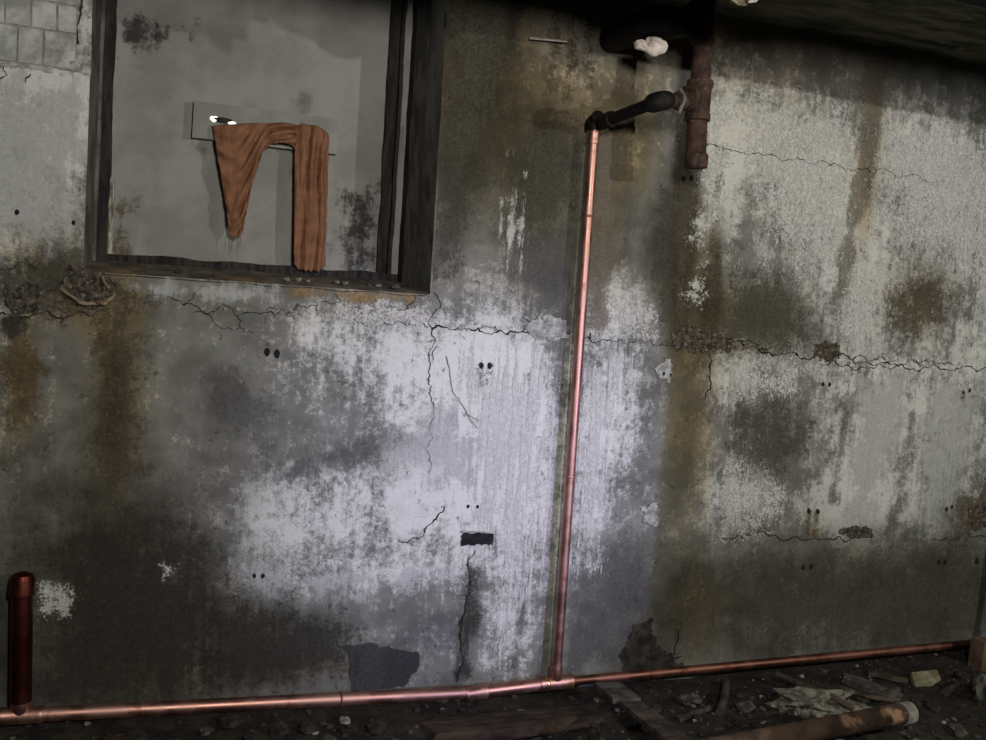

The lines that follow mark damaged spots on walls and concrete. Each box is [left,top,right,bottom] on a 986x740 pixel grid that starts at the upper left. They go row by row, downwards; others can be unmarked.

crack [707,143,945,183]
crack [0,264,96,319]
corrosion [0,315,49,428]
crack [146,286,985,474]
leakage [278,43,986,680]
crack [400,506,445,543]
crack [723,527,865,542]
leakage [33,506,420,702]
crack [456,550,476,682]
spalling [619,618,684,671]